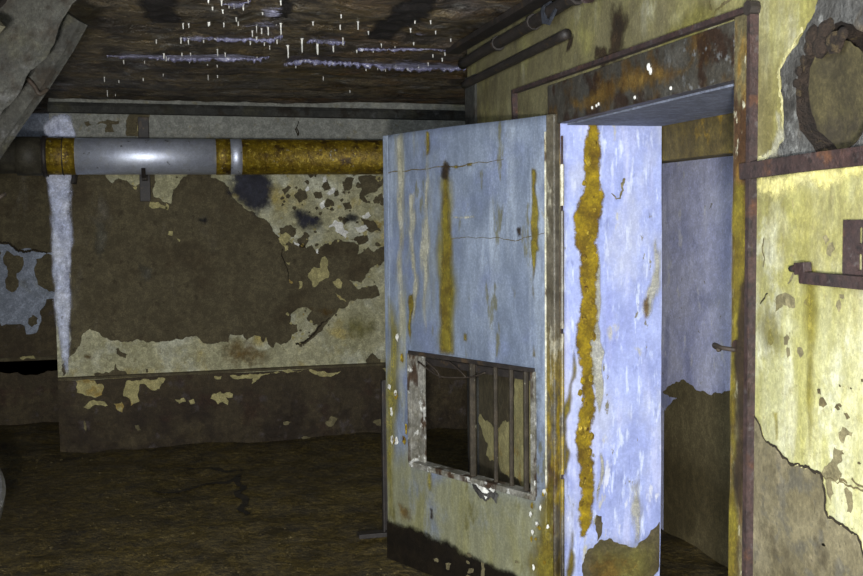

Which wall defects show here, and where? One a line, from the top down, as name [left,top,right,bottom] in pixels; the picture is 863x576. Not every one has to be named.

efflorescence [106,54,270,64]
efflorescence [182,35,283,44]
peeling [0,174,386,376]
rust [438,162,472,354]
rust [517,169,538,275]
rust [564,125,604,576]
peeling [84,400,124,412]
water stain [387,520,518,576]
rust [529,481,553,576]
peeling [582,379,731,576]
peeling [753,388,863,576]
crack [823,476,863,492]